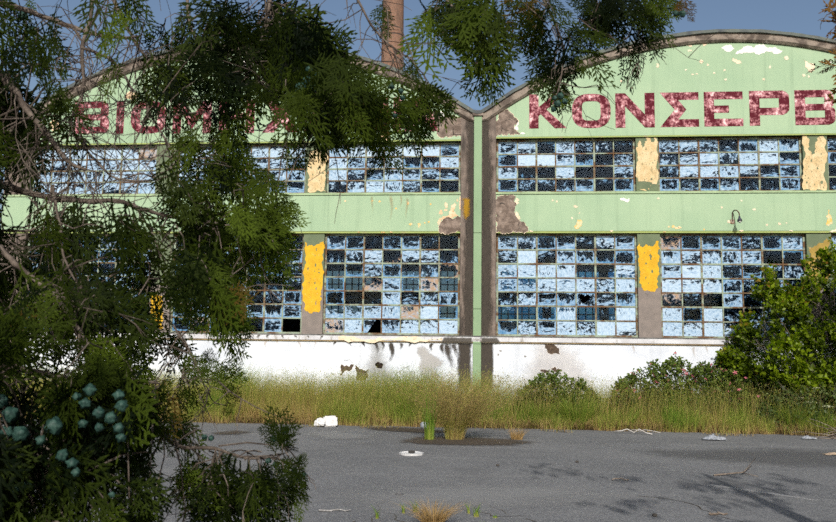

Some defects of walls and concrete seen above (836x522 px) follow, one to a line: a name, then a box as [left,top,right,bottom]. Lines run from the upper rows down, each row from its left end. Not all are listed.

peeling [722,44,789,64]
spalling [496,109,525,137]
peeling [307,151,328,193]
peeling [636,137,659,191]
peeling [802,135,828,190]
spalling [409,196,461,235]
spalling [496,194,533,234]
peeling [302,242,325,314]
peeling [637,241,660,292]
leakage [370,342,412,380]
spalling [545,344,560,355]